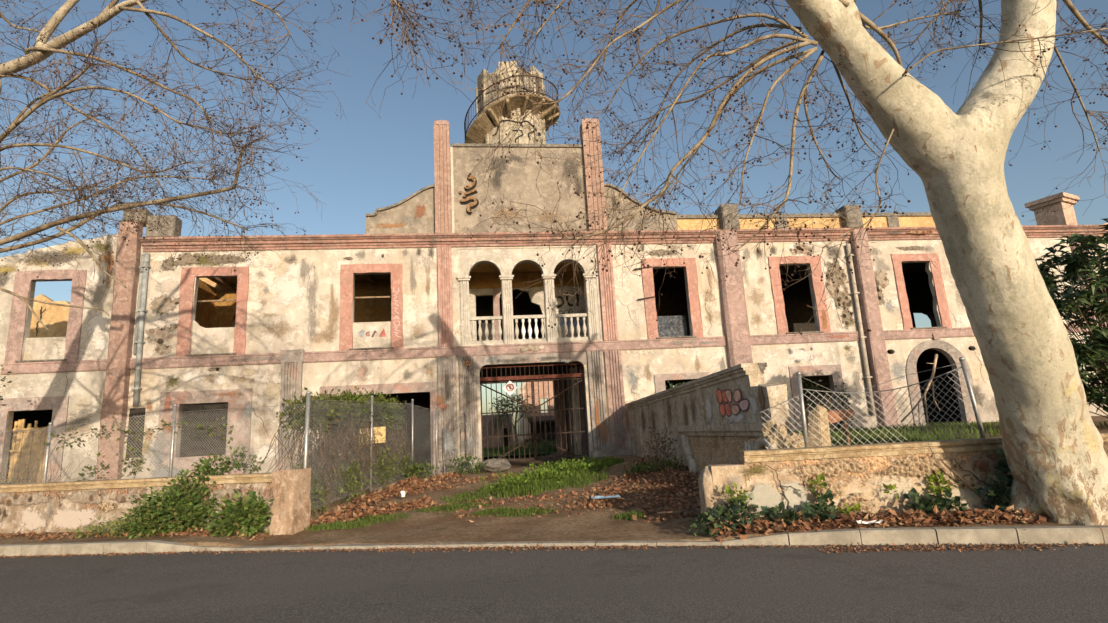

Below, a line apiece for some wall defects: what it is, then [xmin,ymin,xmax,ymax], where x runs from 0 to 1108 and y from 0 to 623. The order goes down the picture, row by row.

flaking render [145,252,253,355]
damp [287,257,317,335]
damp [329,288,339,328]
flaking render [785,241,854,329]
flaking render [0,491,144,531]
flaking render [208,488,249,504]
flaking render [788,452,1009,515]